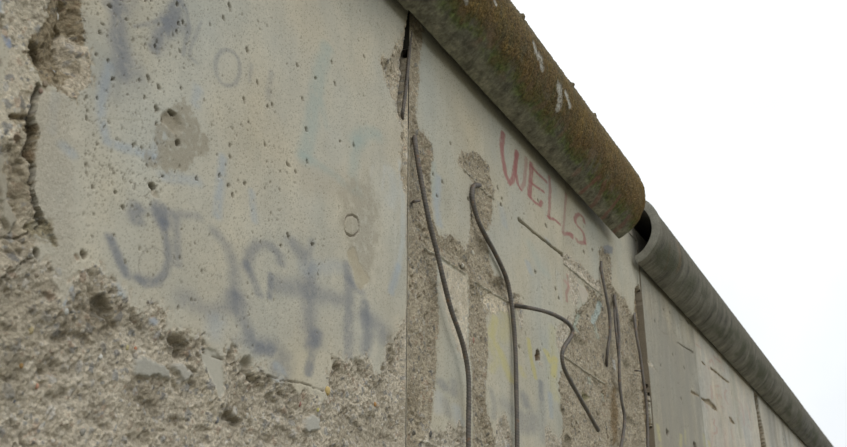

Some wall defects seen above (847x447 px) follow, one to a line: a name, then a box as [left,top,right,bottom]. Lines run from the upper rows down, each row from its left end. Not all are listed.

spalling [0,0,651,447]